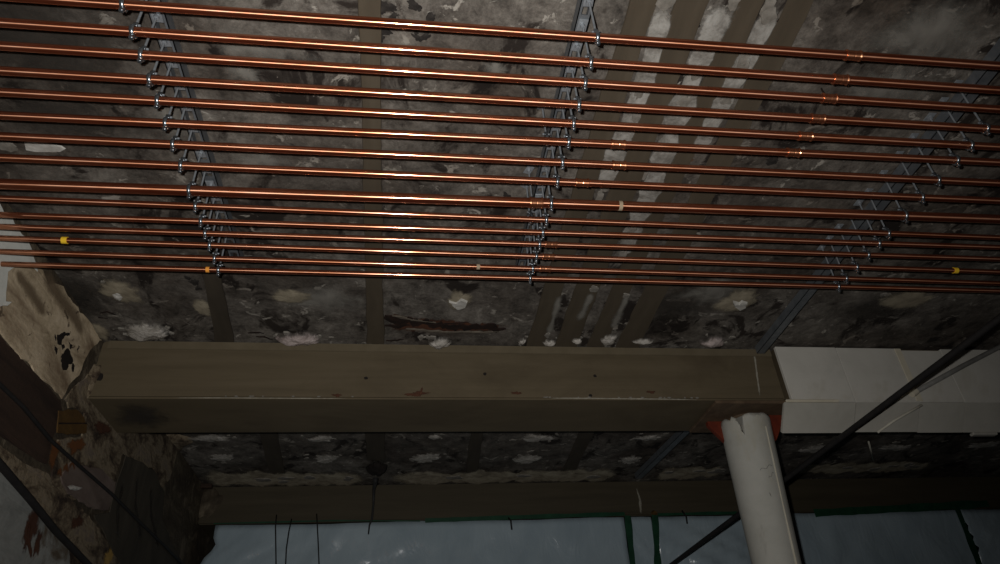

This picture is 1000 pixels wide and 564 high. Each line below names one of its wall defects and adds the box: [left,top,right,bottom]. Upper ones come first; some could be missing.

flaking render [0,204,178,564]